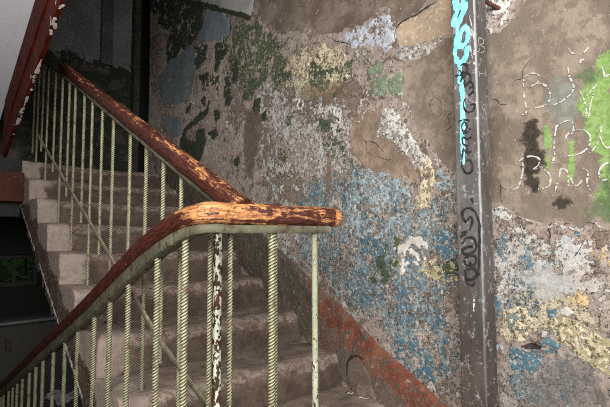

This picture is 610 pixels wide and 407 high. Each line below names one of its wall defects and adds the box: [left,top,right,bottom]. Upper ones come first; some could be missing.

spalling [485,0,610,237]
spalling [150,0,458,326]
crack [346,355,363,376]
peeling [383,336,440,382]
peeling [495,291,610,376]